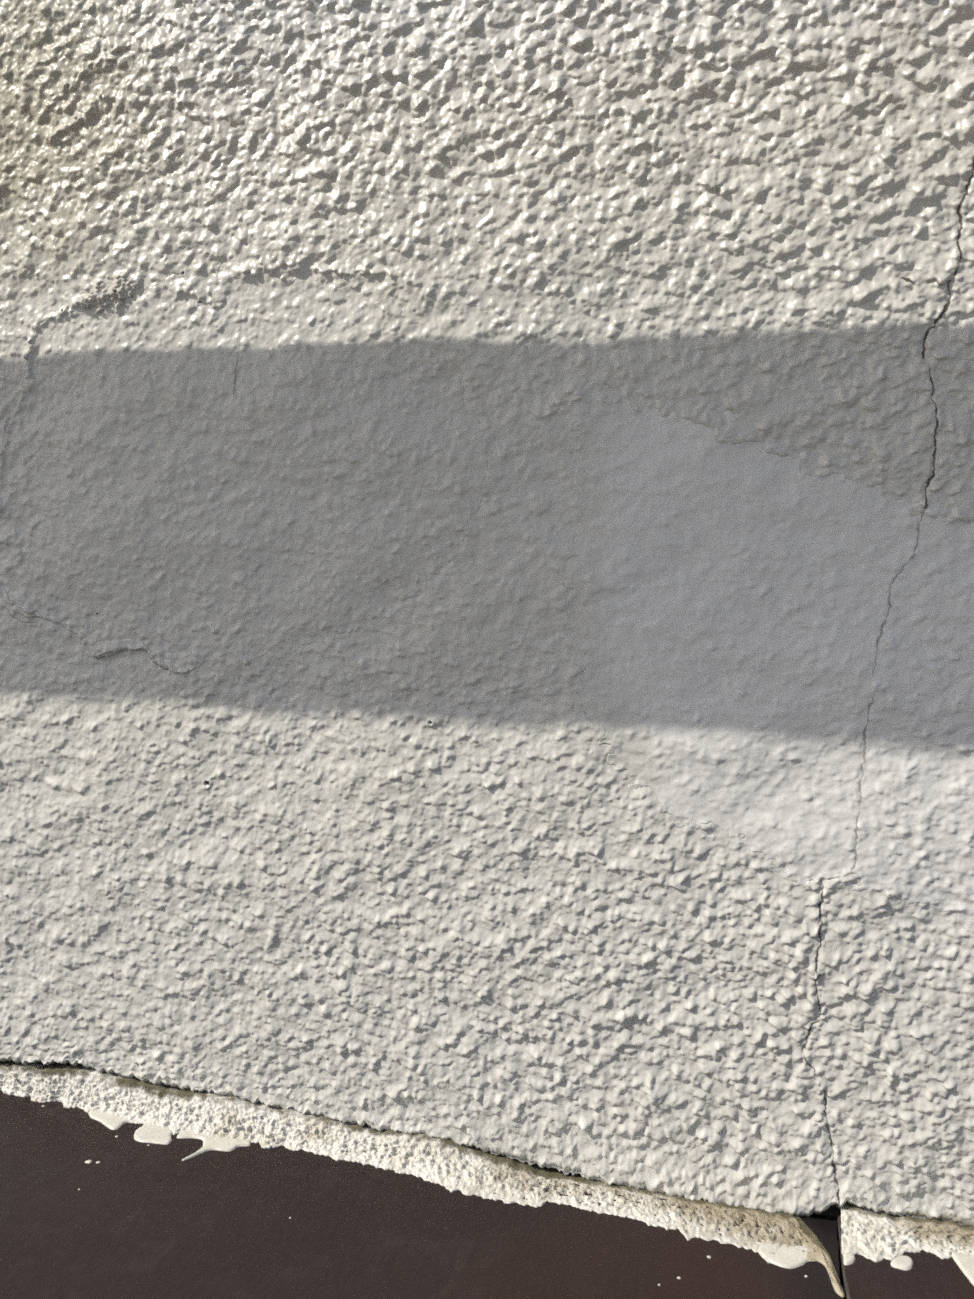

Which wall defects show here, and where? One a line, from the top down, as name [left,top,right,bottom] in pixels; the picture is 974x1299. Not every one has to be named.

crack [801,159,974,1207]